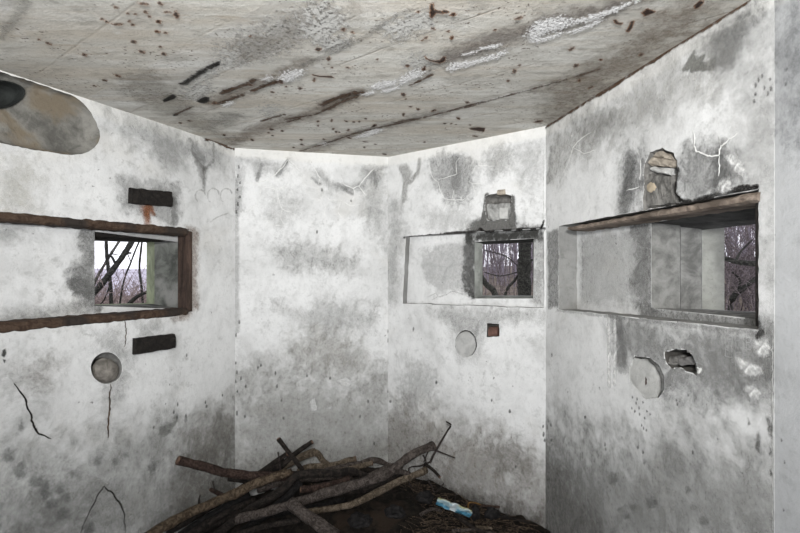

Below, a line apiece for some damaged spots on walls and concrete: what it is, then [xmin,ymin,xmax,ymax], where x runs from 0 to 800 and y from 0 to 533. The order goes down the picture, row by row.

rust [100,1,179,34]
leakage [445,0,640,73]
leakage [259,68,308,83]
spalling [485,189,512,221]
spalling [643,148,682,210]
crack [649,132,759,210]
spalling [665,349,702,376]
crack [14,383,51,439]
crack [105,384,113,438]
crack [81,486,126,532]